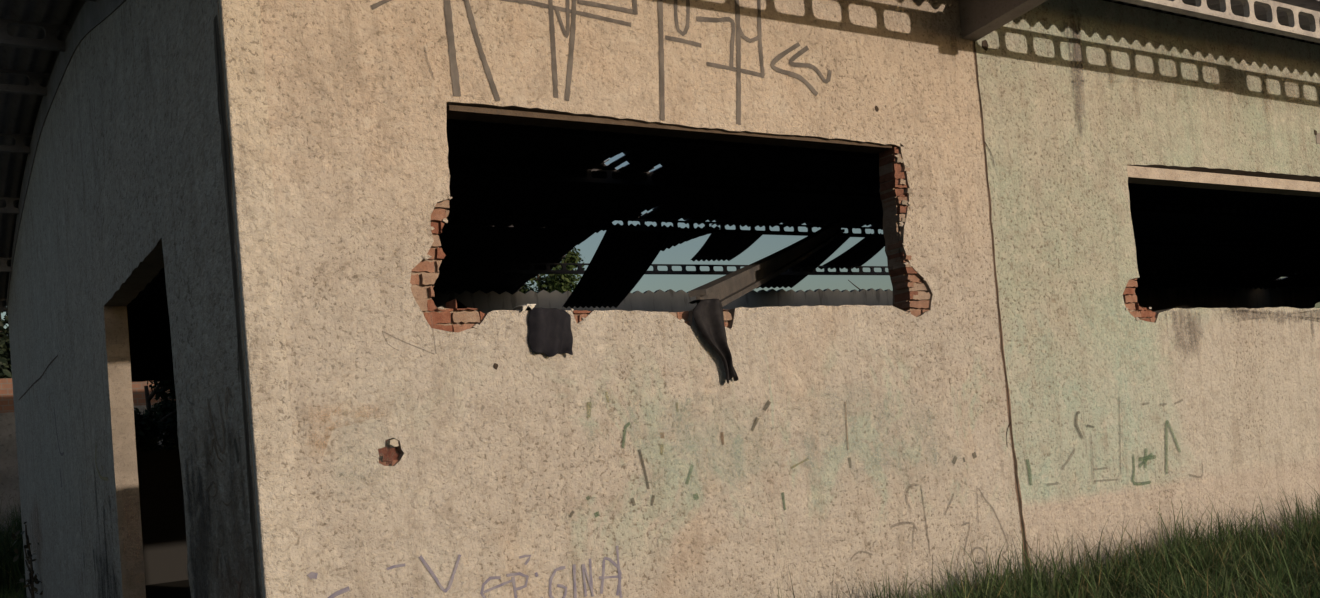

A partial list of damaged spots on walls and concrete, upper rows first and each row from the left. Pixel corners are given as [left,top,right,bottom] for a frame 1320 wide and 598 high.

flaking render [879,147,931,317]
flaking render [408,197,485,332]
flaking render [1123,278,1156,322]
flaking render [571,309,591,323]
flaking render [670,308,694,325]
flaking render [723,309,734,330]
spalling [378,439,401,466]